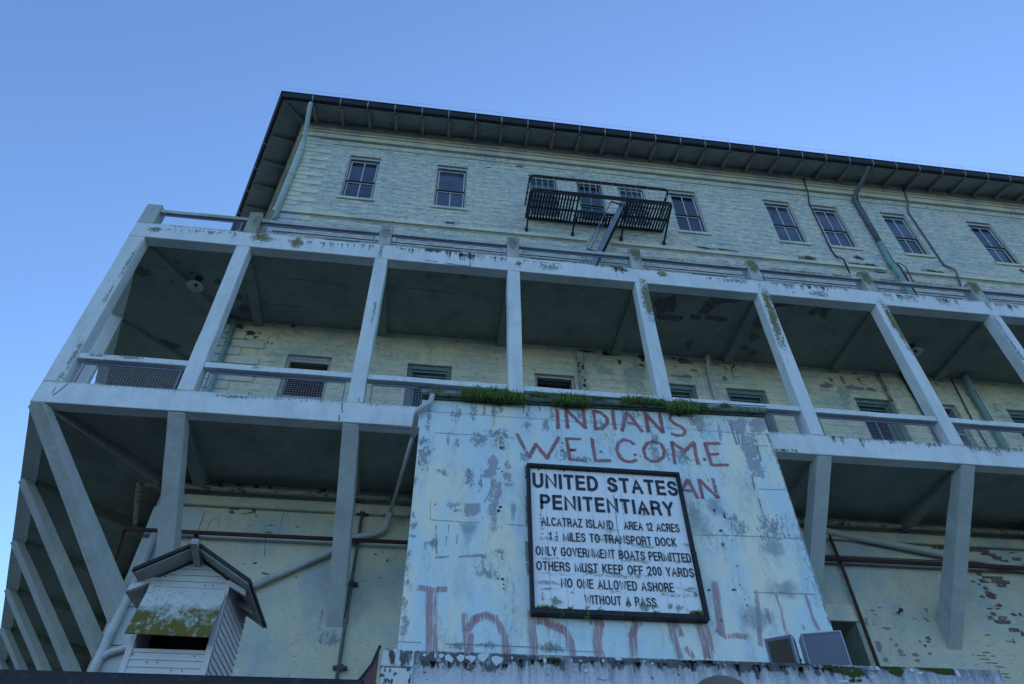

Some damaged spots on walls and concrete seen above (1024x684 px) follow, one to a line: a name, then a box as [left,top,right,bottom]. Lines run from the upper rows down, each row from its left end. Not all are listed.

peeling [717,417,767,479]
peeling [464,442,513,527]
peeling [969,548,1022,562]
peeling [970,572,1024,644]
peeling [423,642,513,676]
peeling [537,642,588,675]